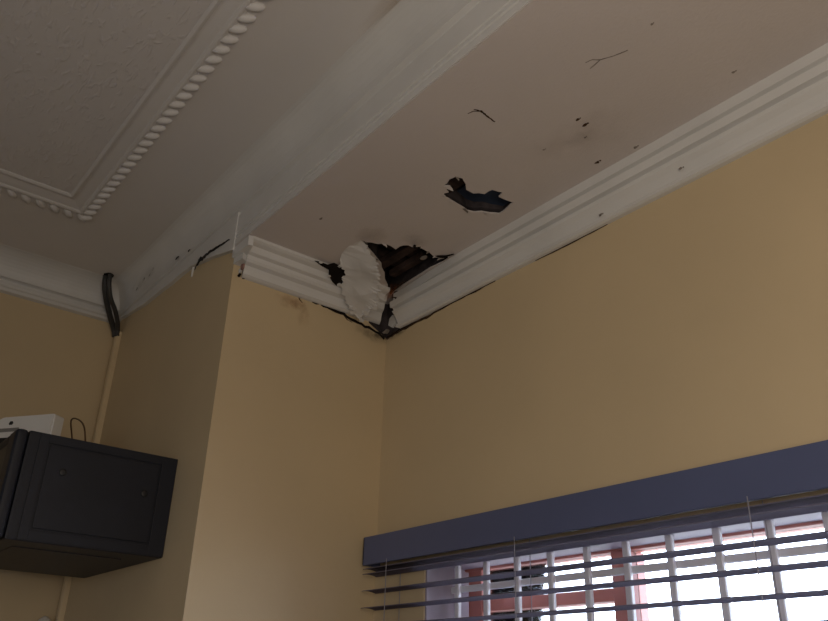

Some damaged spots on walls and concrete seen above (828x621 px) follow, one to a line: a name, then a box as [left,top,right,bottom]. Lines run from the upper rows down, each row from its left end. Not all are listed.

spalling [444,176,512,214]
crack [194,239,230,270]
flaking render [315,240,448,339]